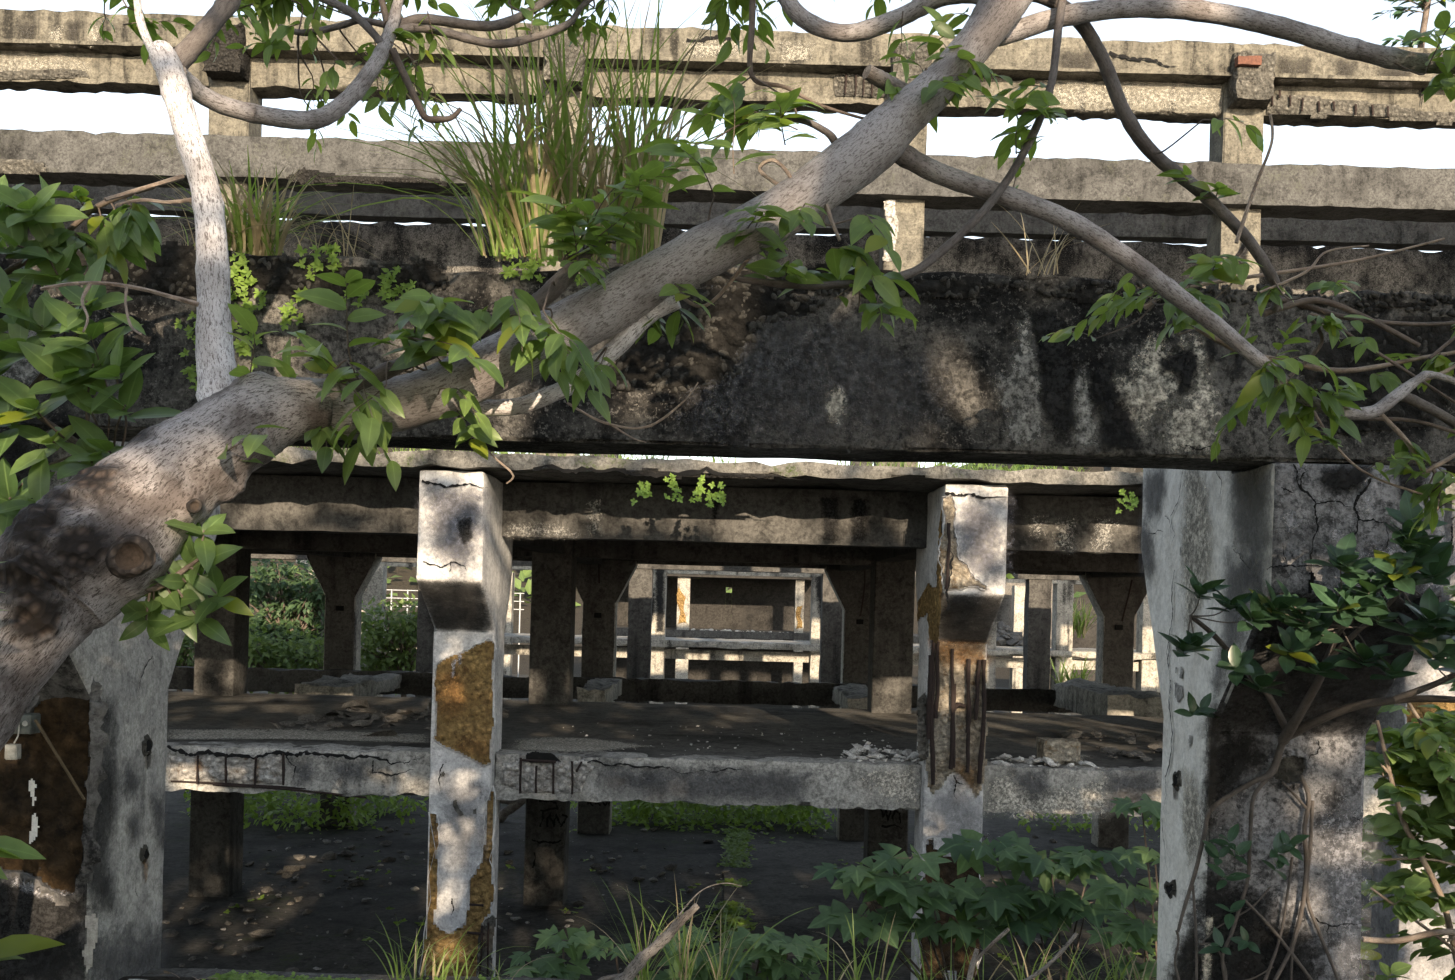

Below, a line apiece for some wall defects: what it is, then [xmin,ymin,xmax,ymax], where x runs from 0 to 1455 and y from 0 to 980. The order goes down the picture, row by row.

spalling [0,678,109,973]
leakage [167,729,427,743]
spalling [419,638,596,977]
spalling [916,494,988,798]
leakage [995,309,1244,452]
leakage [984,464,1445,980]
crack [1233,464,1400,571]